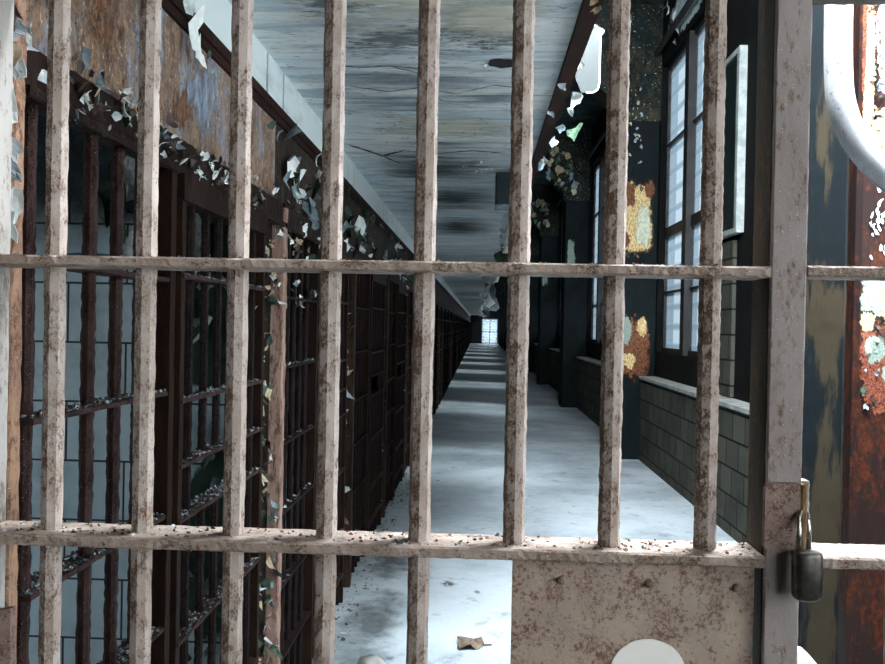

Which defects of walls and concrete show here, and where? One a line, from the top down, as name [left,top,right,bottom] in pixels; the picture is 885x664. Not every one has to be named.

rust [76,0,124,58]
rust [172,89,193,129]
peeling [250,153,322,260]
damp [437,156,483,178]
damp [436,220,485,233]
damp [437,190,495,207]
peeling [538,83,583,195]
peeling [625,180,655,257]
peeling [862,5,885,152]
peeling [869,188,885,259]
peeling [859,281,885,331]
rust [858,320,885,417]